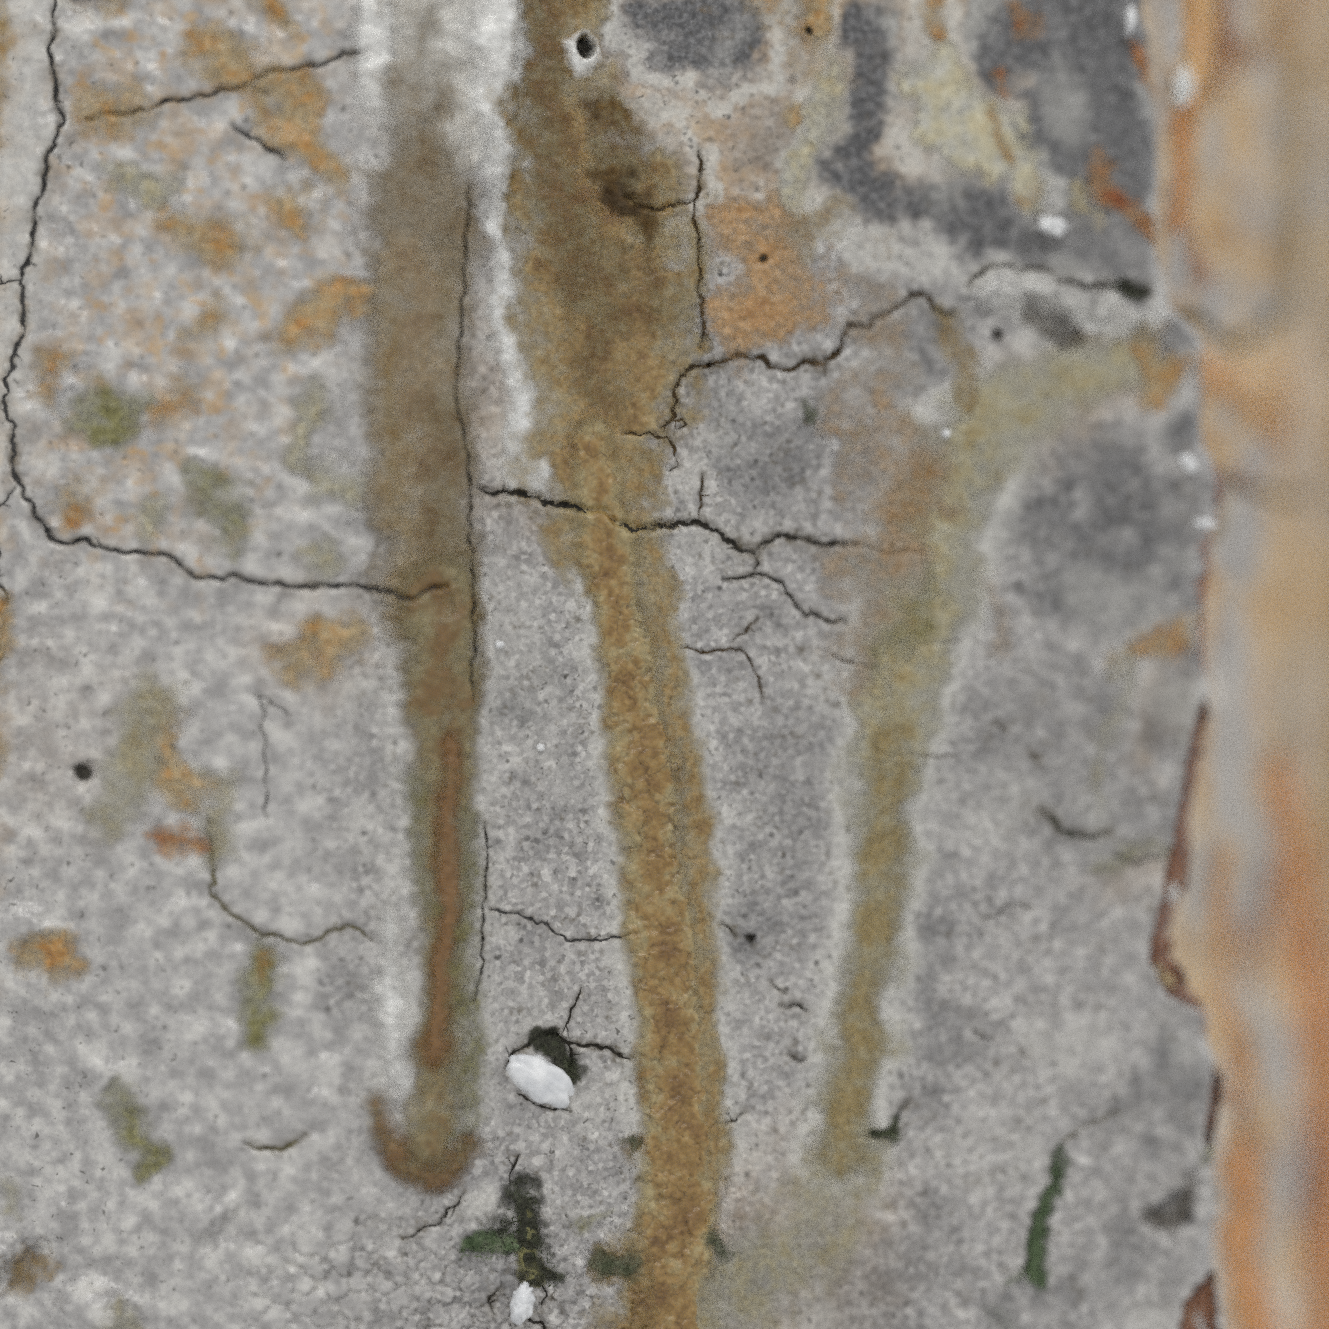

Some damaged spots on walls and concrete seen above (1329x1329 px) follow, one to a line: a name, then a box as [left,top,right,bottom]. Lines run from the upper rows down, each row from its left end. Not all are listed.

corrosion [185,26,348,184]
corrosion [157,215,240,263]
corrosion [269,195,307,240]
corrosion [279,274,373,349]
crack [0,0,1143,700]
corrosion [498,0,838,1329]
crack [474,826,624,1001]
damp [696,340,1147,1329]
spalling [1149,701,1208,1006]
spalling [506,1054,575,1109]
spalling [1200,1065,1221,1165]
spalling [1179,1272,1219,1329]